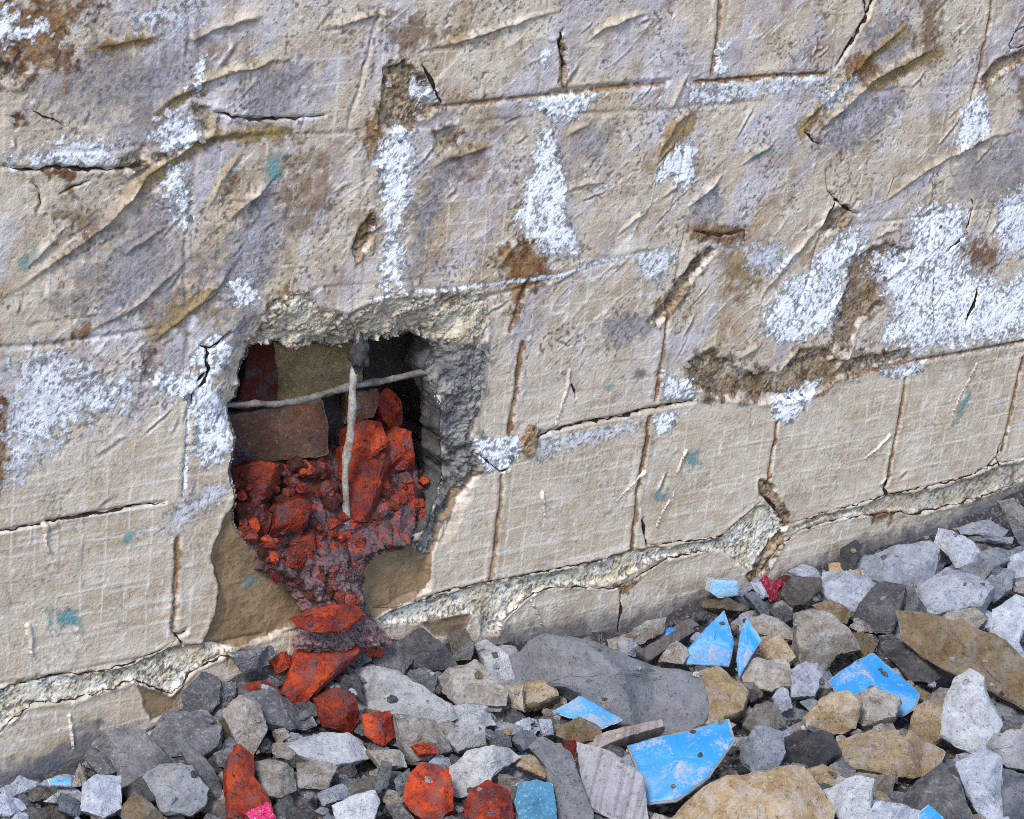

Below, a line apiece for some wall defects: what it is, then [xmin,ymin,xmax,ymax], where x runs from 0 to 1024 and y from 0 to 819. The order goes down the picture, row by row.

crack [837,0,872,63]
crack [216,112,321,121]
crack [823,169,855,225]
peeling [0,37,1024,555]
crack [190,334,227,403]
crack [0,502,165,531]
crack [373,449,1021,629]
crack [0,631,246,728]